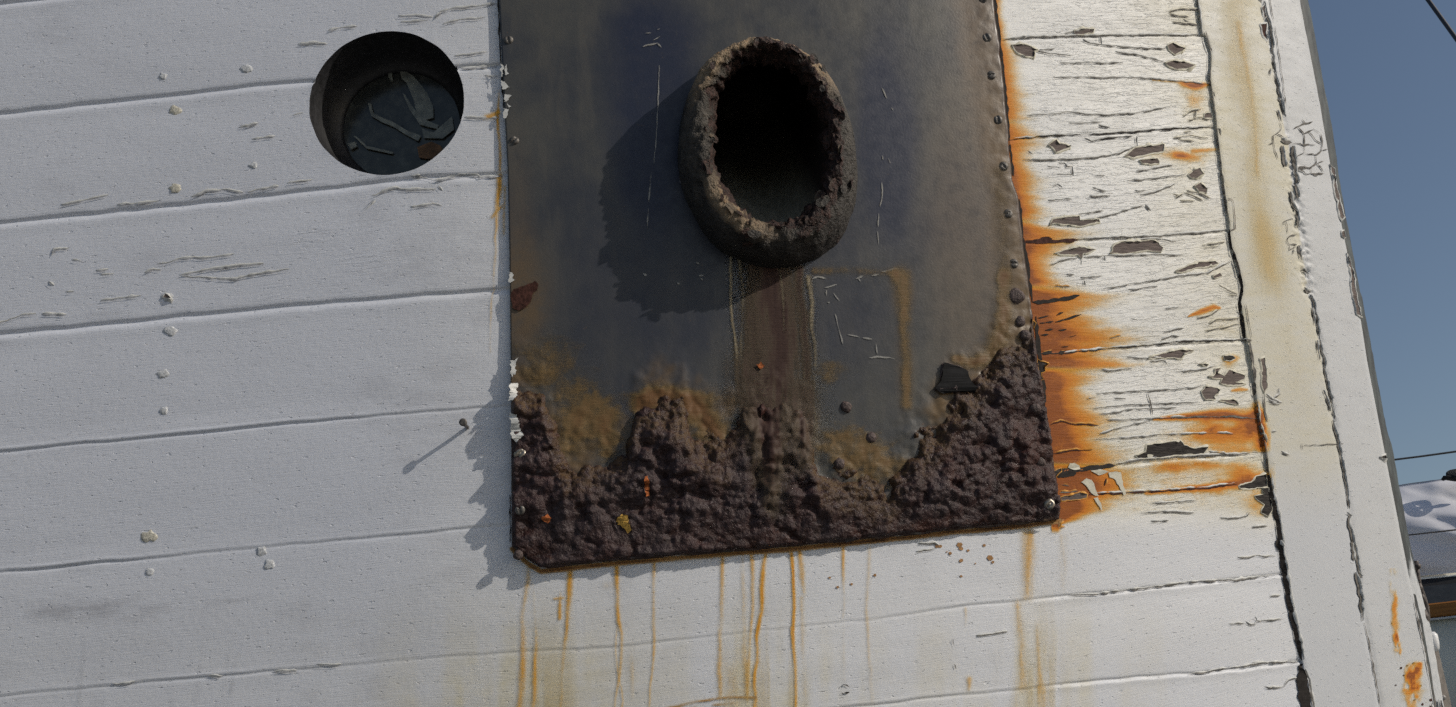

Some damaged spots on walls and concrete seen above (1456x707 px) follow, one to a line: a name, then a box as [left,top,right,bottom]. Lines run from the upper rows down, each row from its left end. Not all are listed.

peeling [1011,41,1039,60]
peeling [1164,41,1196,72]
peeling [1047,138,1071,154]
peeling [1124,142,1165,166]
peeling [1186,167,1208,195]
peeling [1049,214,1164,259]
peeling [1174,258,1222,280]
rust [511,0,1270,707]
crack [994,0,1381,707]
peeling [1147,347,1268,405]
rust [1391,594,1432,707]
crack [1414,597,1436,707]